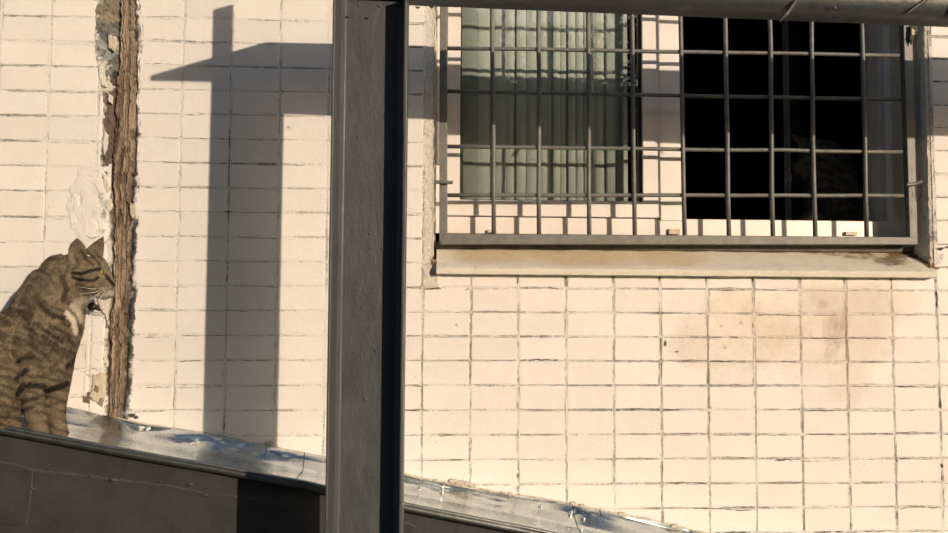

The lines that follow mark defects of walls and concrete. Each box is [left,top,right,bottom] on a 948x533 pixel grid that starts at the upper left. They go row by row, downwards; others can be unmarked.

peeling [65,0,122,279]
spalling [122,0,144,420]
peeling [83,296,114,416]